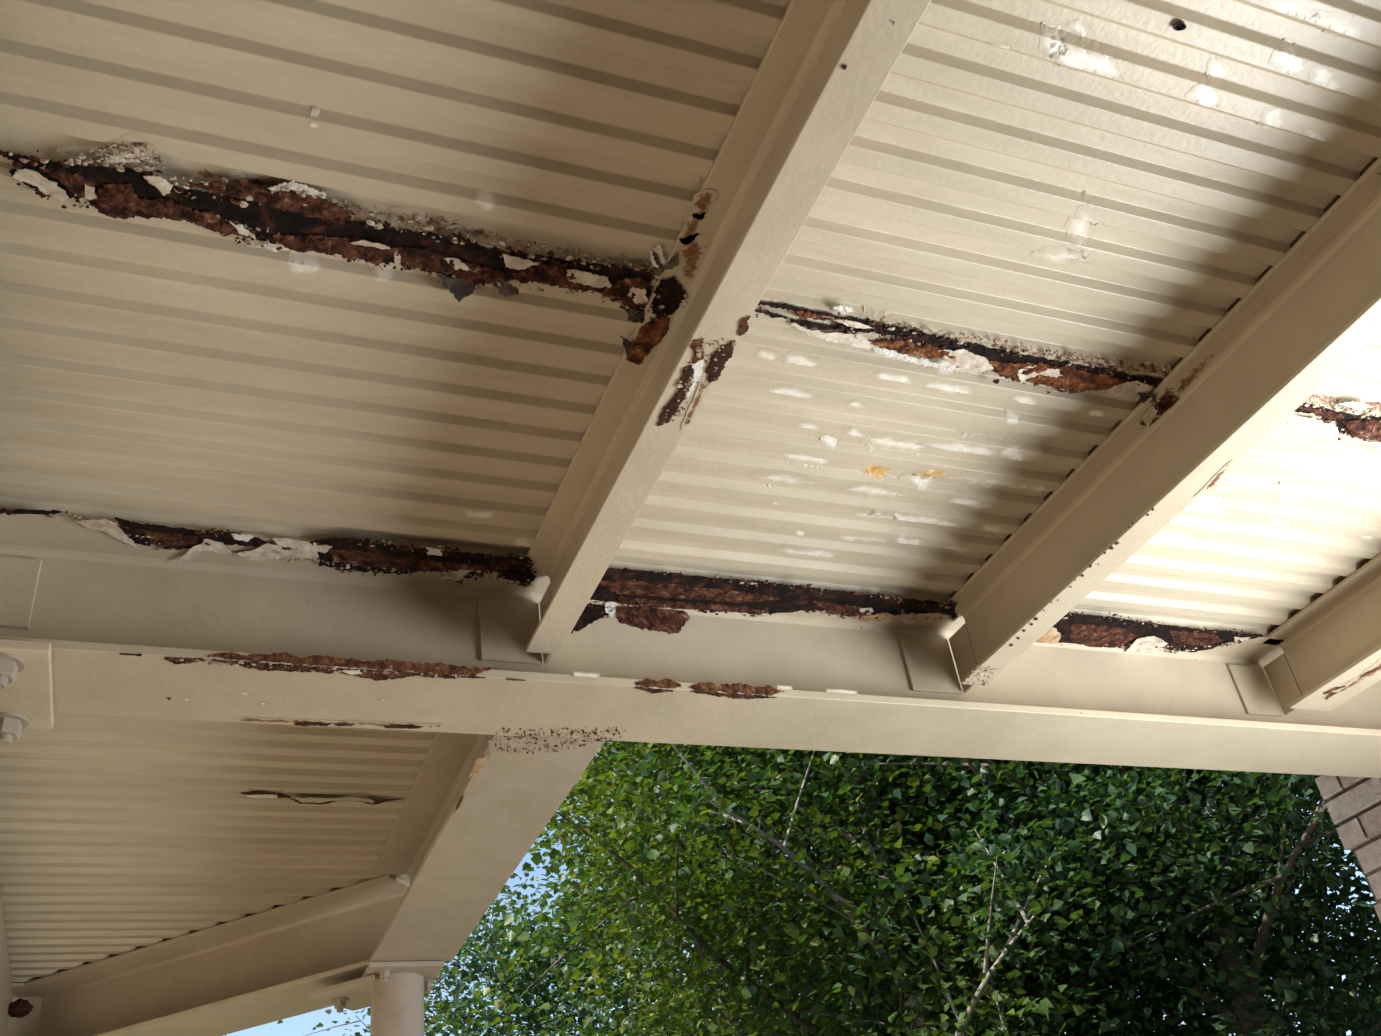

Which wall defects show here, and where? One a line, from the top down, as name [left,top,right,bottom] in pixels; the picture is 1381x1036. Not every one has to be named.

rust [0,150,717,365]
rust [657,300,1220,434]
rust [1295,392,1381,435]
rust [115,517,268,550]
rust [314,537,541,593]
rust [571,567,958,634]
rust [164,652,492,681]
rust [573,671,600,679]
rust [635,678,792,699]